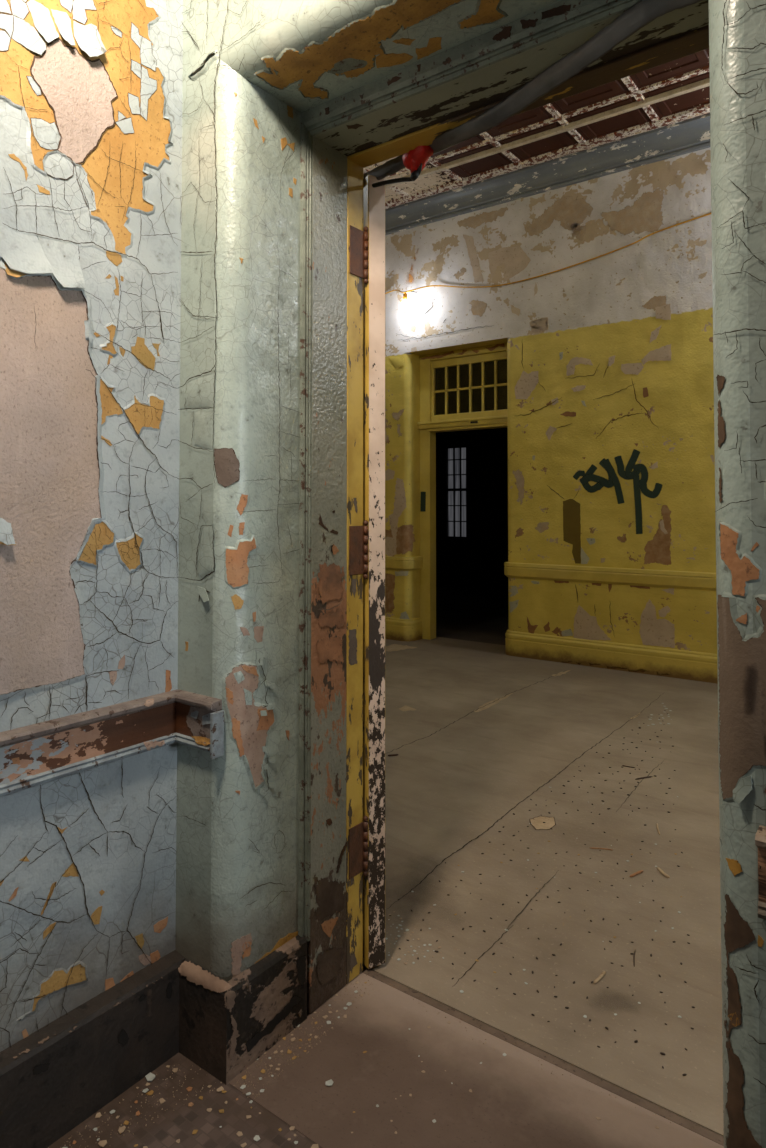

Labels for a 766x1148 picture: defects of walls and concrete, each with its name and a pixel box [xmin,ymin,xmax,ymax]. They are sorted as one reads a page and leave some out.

peeling [0,0,173,296]
peeling [253,0,571,115]
flaking render [525,188,664,240]
crack [717,0,766,283]
flaking render [0,226,166,701]
crack [2,0,261,723]
peeling [214,448,264,643]
crack [714,328,766,528]
peeling [186,662,290,795]
crack [0,767,207,1047]
peeling [186,931,366,1128]
peeling [724,894,764,1148]